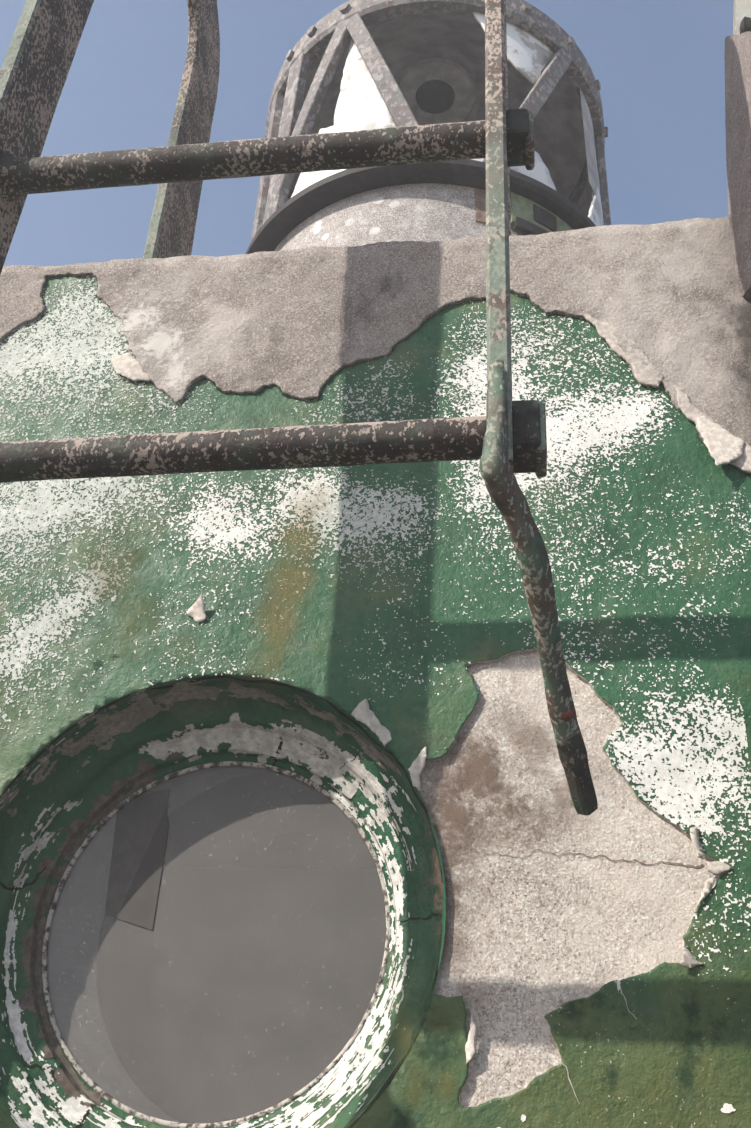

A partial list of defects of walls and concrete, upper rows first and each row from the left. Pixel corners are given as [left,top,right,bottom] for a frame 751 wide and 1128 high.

damp [117,293,217,390]
peeling [0,237,487,442]
peeling [408,216,751,1108]
crack [0,867,47,891]
peeling [0,459,522,1128]
crack [0,675,703,878]
crack [344,912,442,1128]
peeling [721,1103,736,1113]